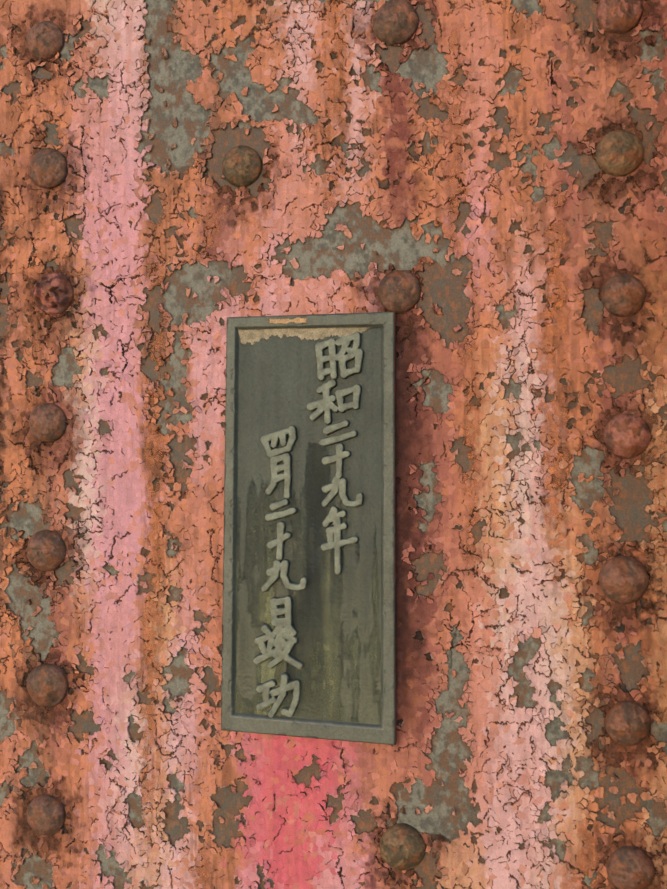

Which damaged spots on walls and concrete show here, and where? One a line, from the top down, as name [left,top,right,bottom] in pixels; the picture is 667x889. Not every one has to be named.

peeling [133,0,330,205]
crack [80,125,88,190]
crack [100,279,127,304]
corrosion [593,266,652,346]
corrosion [593,401,658,476]
peeling [0,462,99,690]
corrosion [583,541,662,631]
peeling [61,573,222,779]
peeling [497,616,667,867]
corrosion [593,680,663,770]
corrosion [13,783,71,858]
peeling [121,763,195,855]